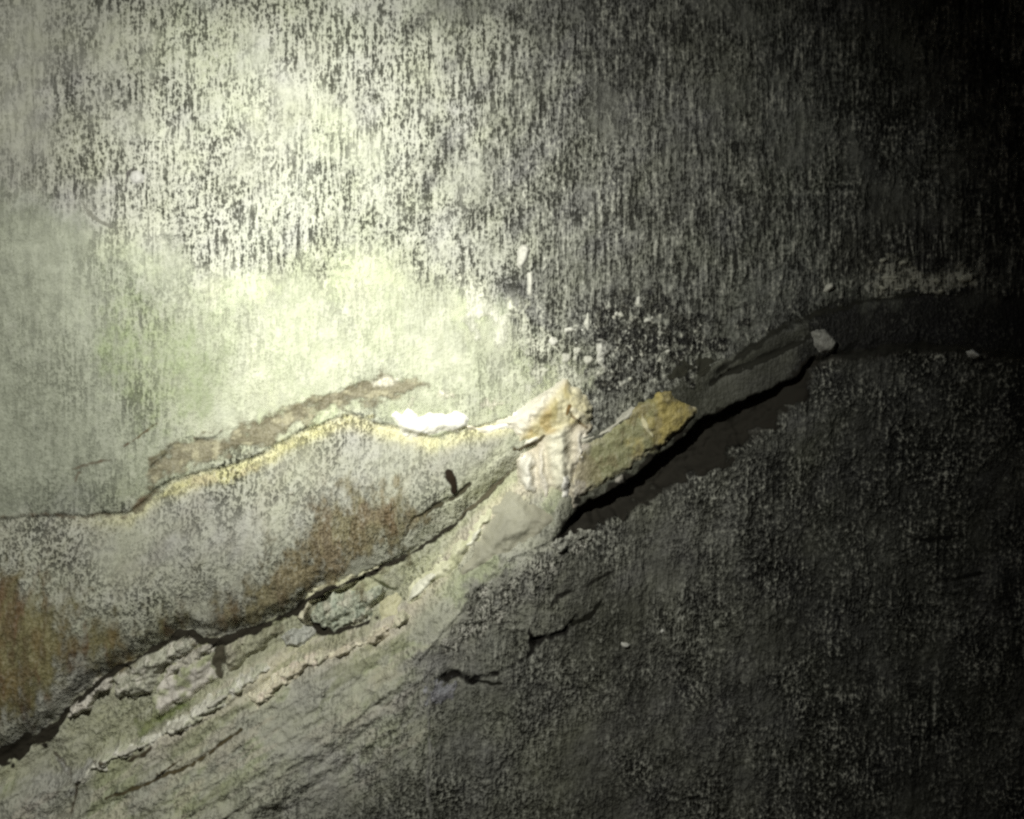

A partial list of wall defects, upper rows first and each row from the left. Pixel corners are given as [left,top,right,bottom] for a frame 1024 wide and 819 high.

damp [0,207,618,512]
damp [608,297,662,327]
peeling [811,329,837,353]
spalling [573,391,697,498]
corrosion [211,476,431,631]
spalling [441,528,596,661]
spalling [67,625,316,789]